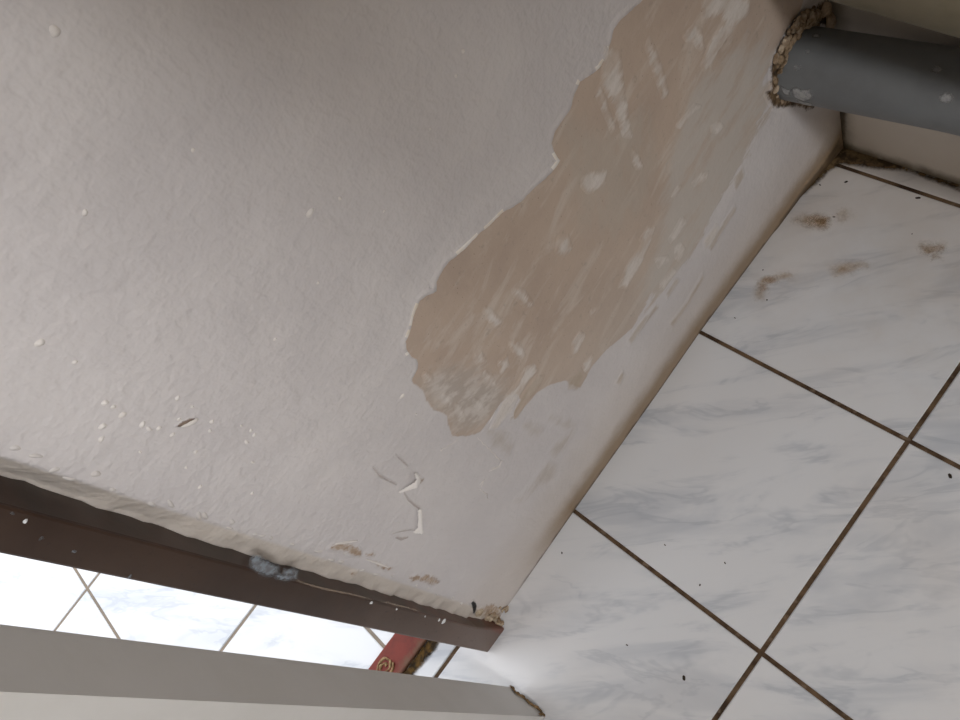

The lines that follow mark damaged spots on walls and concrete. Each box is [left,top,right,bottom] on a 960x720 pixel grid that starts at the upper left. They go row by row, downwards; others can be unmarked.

peeling [372,0,836,463]